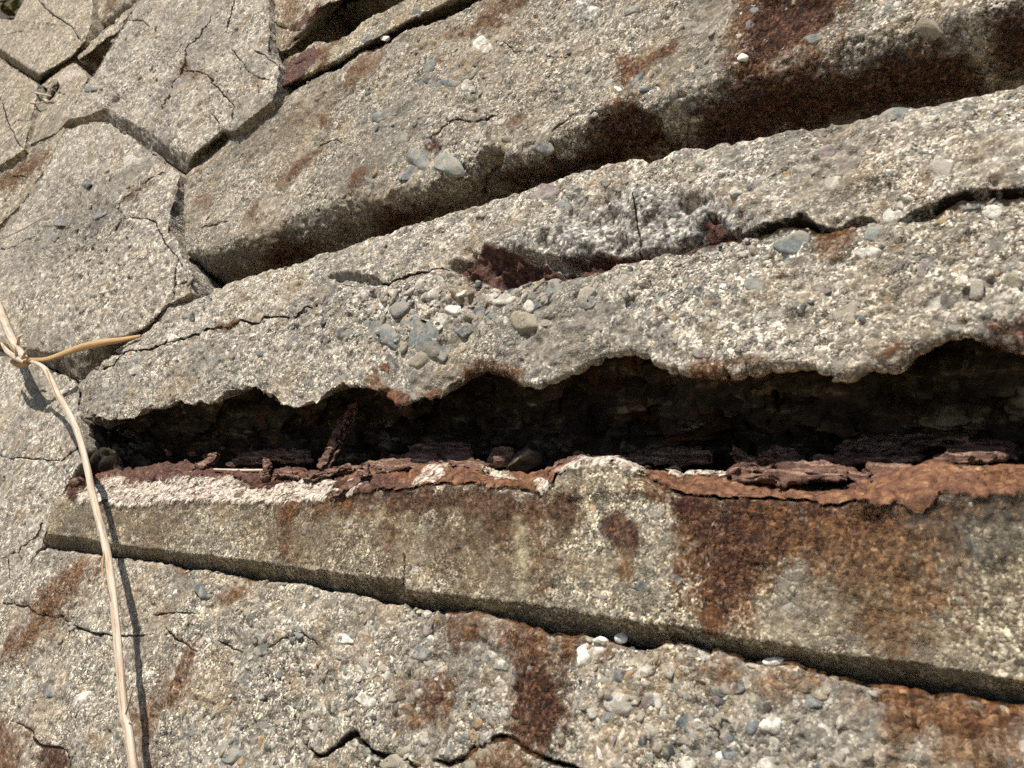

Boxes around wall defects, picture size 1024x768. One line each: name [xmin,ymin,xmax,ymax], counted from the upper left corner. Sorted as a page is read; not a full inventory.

crack [160,0,310,127]
rust [495,0,1024,193]
spalling [845,117,933,210]
crack [734,212,861,243]
crack [904,185,1024,224]
spalling [720,283,837,359]
spalling [801,463,866,496]
spalling [904,448,947,466]
rust [600,510,641,581]
rust [613,445,1024,664]
rust [431,612,611,768]
crack [305,731,578,768]